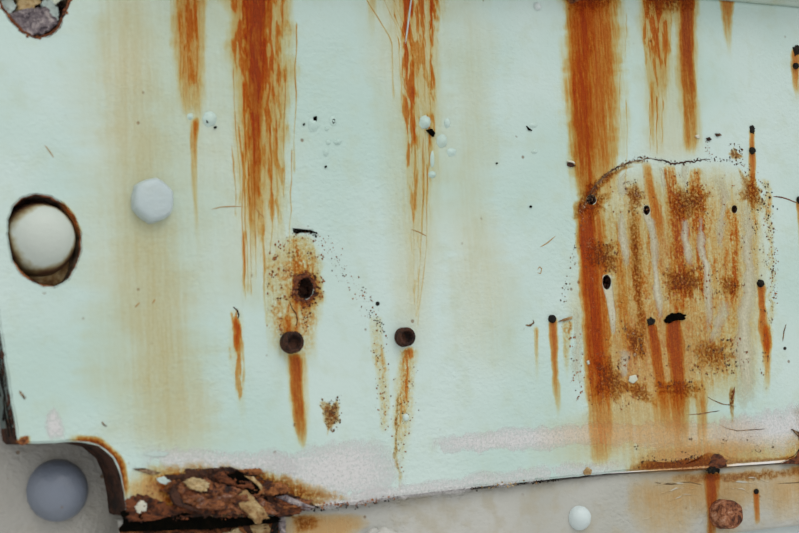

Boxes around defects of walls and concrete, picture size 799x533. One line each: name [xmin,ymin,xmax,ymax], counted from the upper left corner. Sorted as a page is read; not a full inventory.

rust [267,225,360,331]
rust [569,143,779,410]
rust [320,395,342,432]
rust [349,287,419,453]
rust [118,466,395,533]
rust [634,448,763,494]